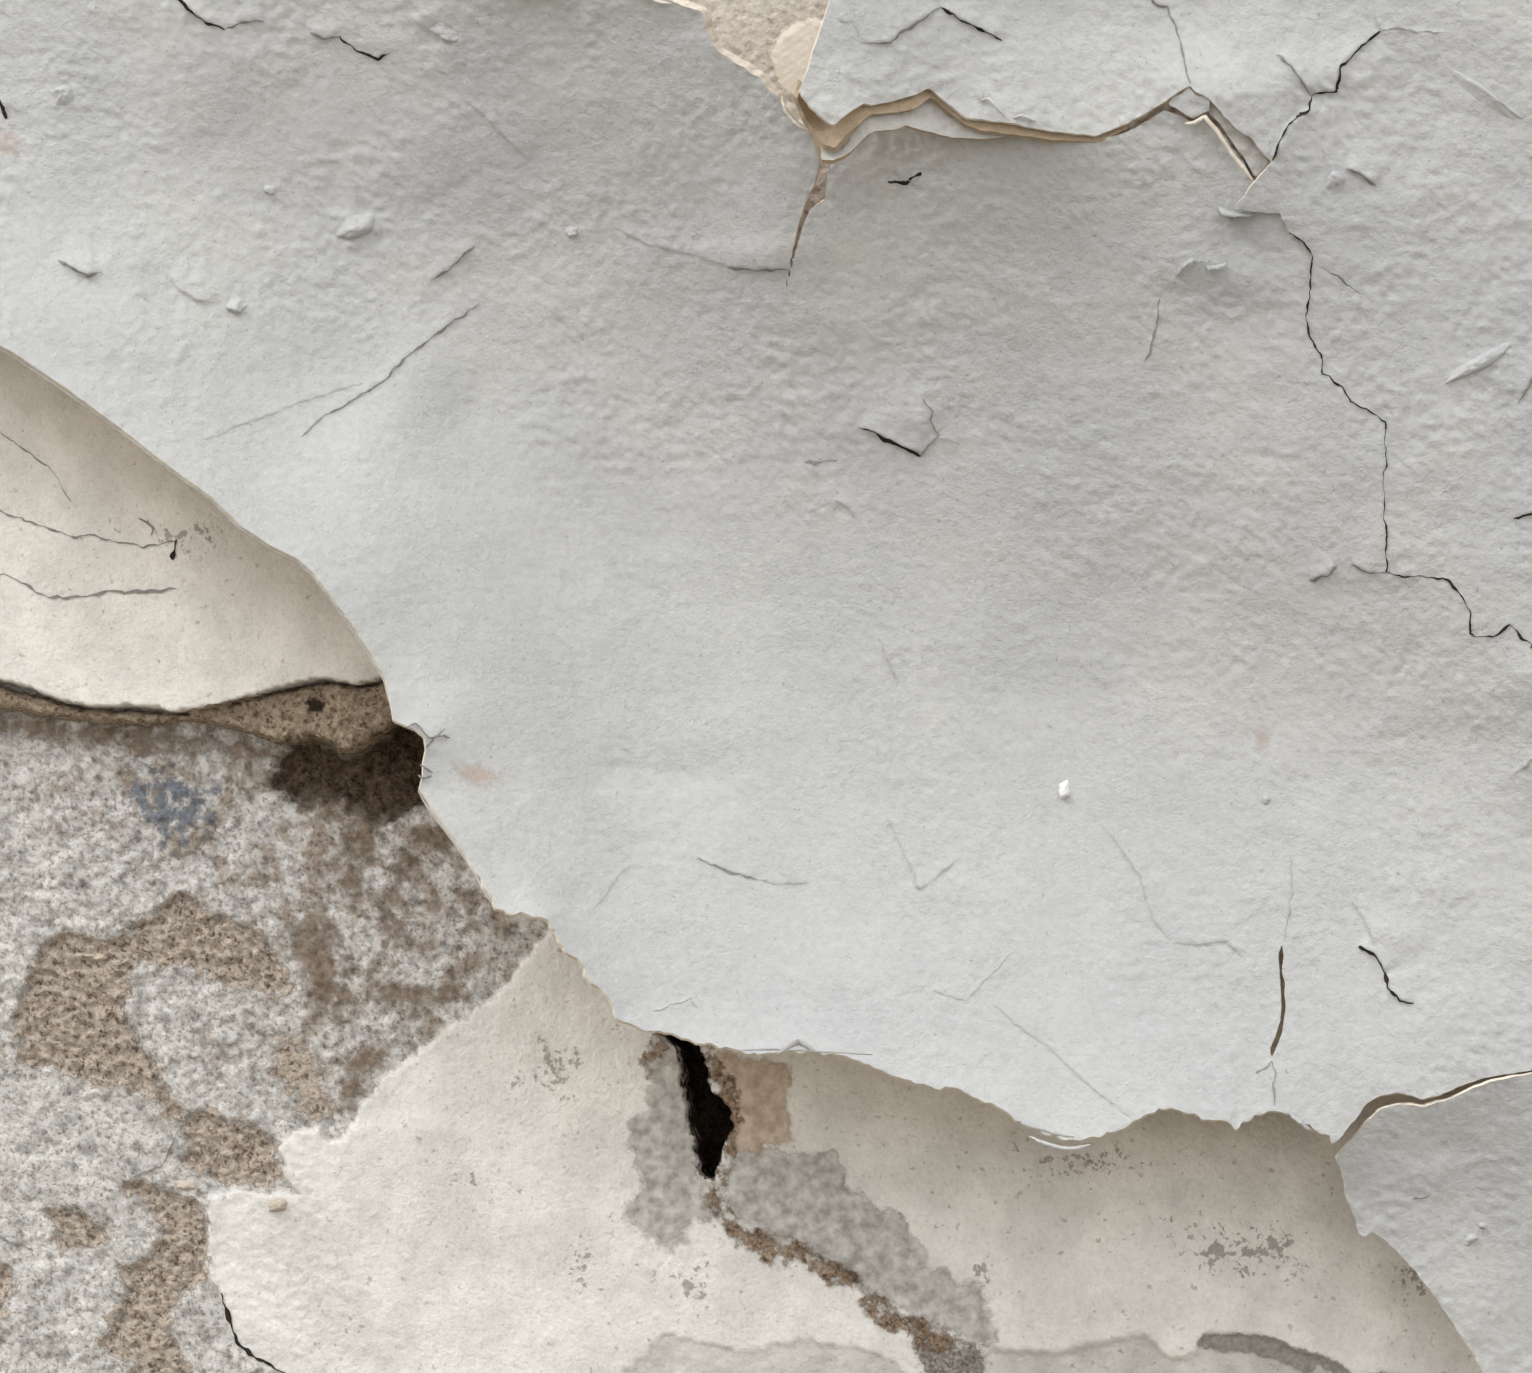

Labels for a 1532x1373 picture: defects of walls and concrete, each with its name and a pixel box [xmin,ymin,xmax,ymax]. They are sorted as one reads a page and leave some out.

crack [1272,12,1445,161]
peeling [793,0,1532,645]
crack [1289,233,1532,648]
crack [0,573,176,600]
flaking render [0,682,402,756]
water stain [115,761,221,856]
water stain [298,782,391,897]
flaking render [7,890,296,1188]
water stain [288,915,355,1024]
crack [1350,899,1414,1004]
water stain [624,1033,998,1346]
flaking render [38,1178,212,1373]